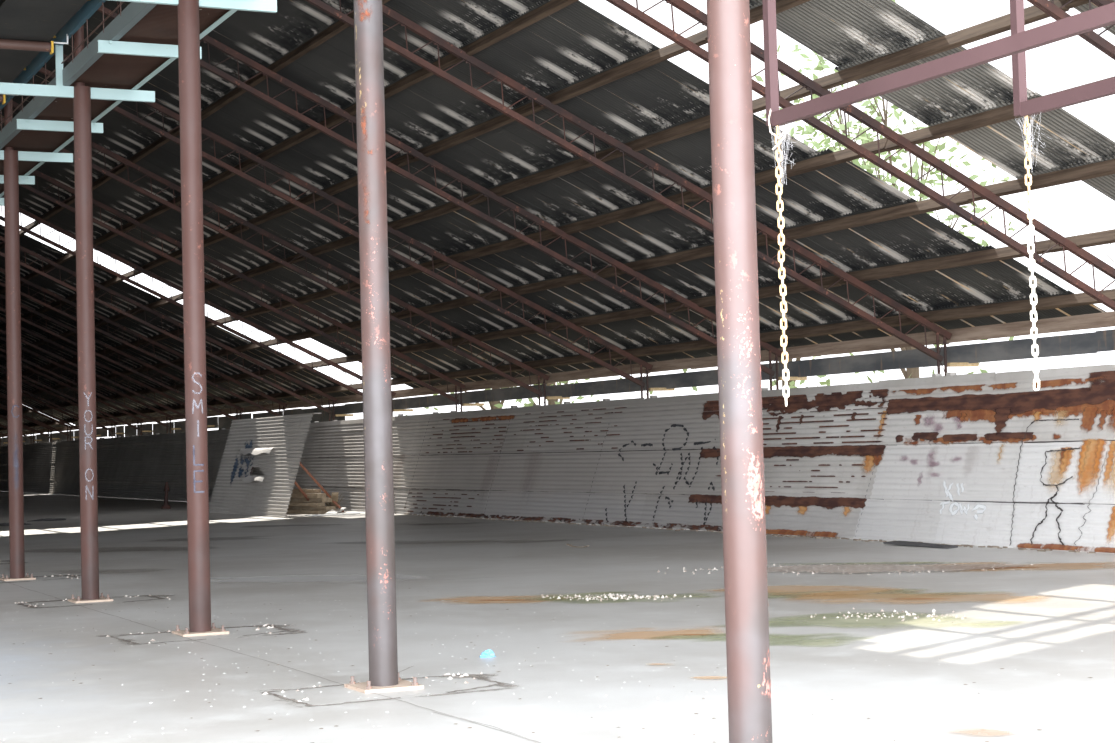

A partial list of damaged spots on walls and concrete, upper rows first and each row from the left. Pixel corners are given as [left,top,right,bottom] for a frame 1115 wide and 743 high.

corrosion [702,400,719,420]
corrosion [700,448,720,458]
corrosion [762,371,1115,515]
corrosion [766,529,838,537]
corrosion [945,506,1115,570]
crack [372,666,541,743]